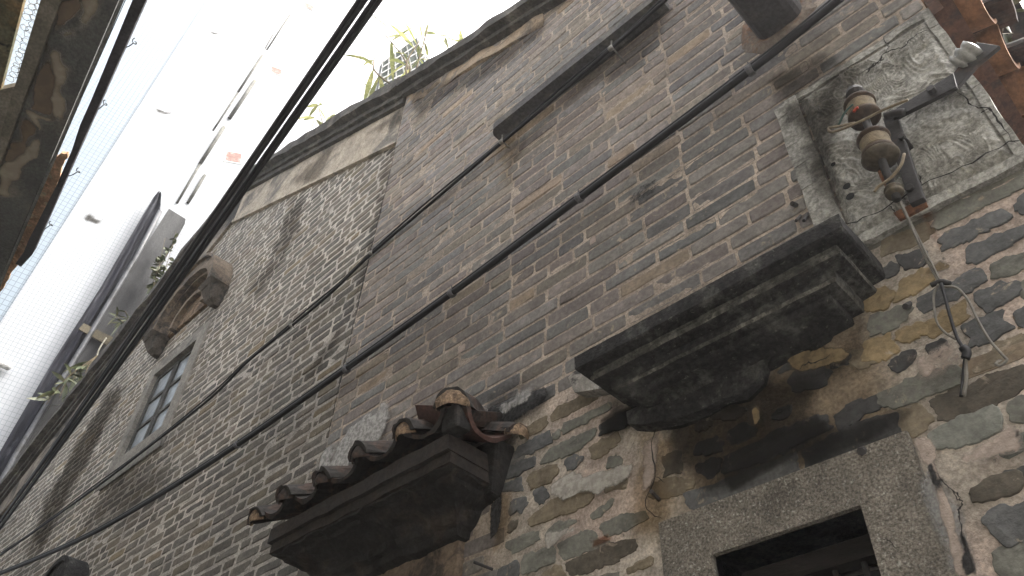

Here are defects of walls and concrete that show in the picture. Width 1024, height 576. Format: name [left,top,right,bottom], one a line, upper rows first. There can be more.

crack [859,30,927,74]
crack [845,91,1024,224]
water stain [602,406,635,434]
water stain [674,381,826,488]
crack [935,472,973,570]